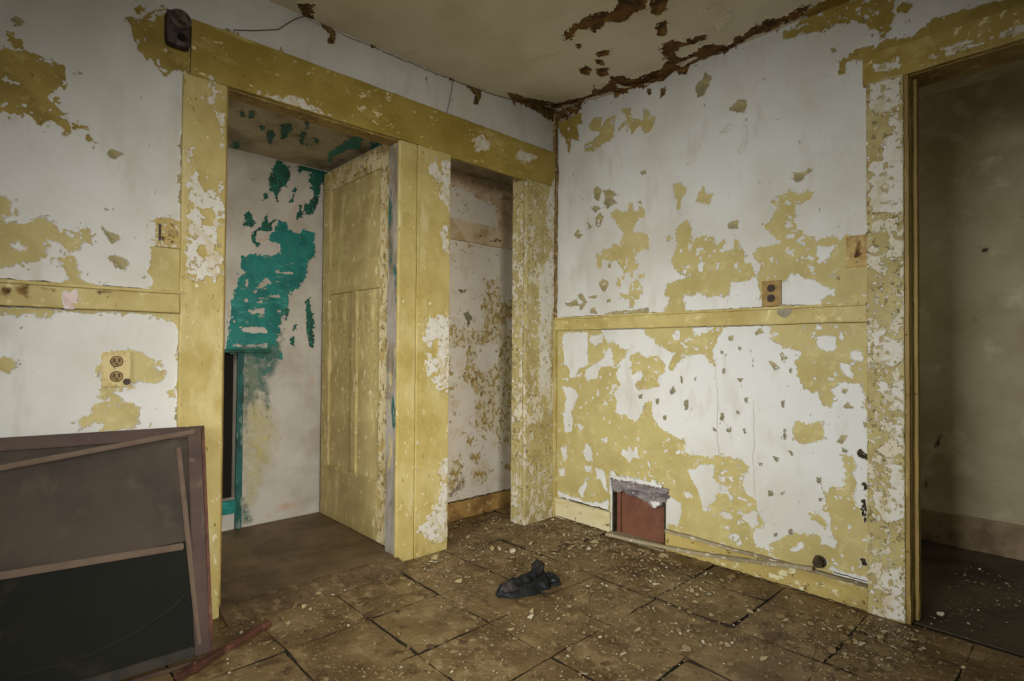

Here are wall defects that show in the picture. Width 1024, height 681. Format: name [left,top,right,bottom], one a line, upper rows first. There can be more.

peeling [0,12,124,160]
peeling [471,134,493,154]
peeling [506,0,1024,220]
peeling [0,195,129,285]
peeling [145,74,381,499]
peeling [0,306,179,432]
peeling [202,157,1023,681]